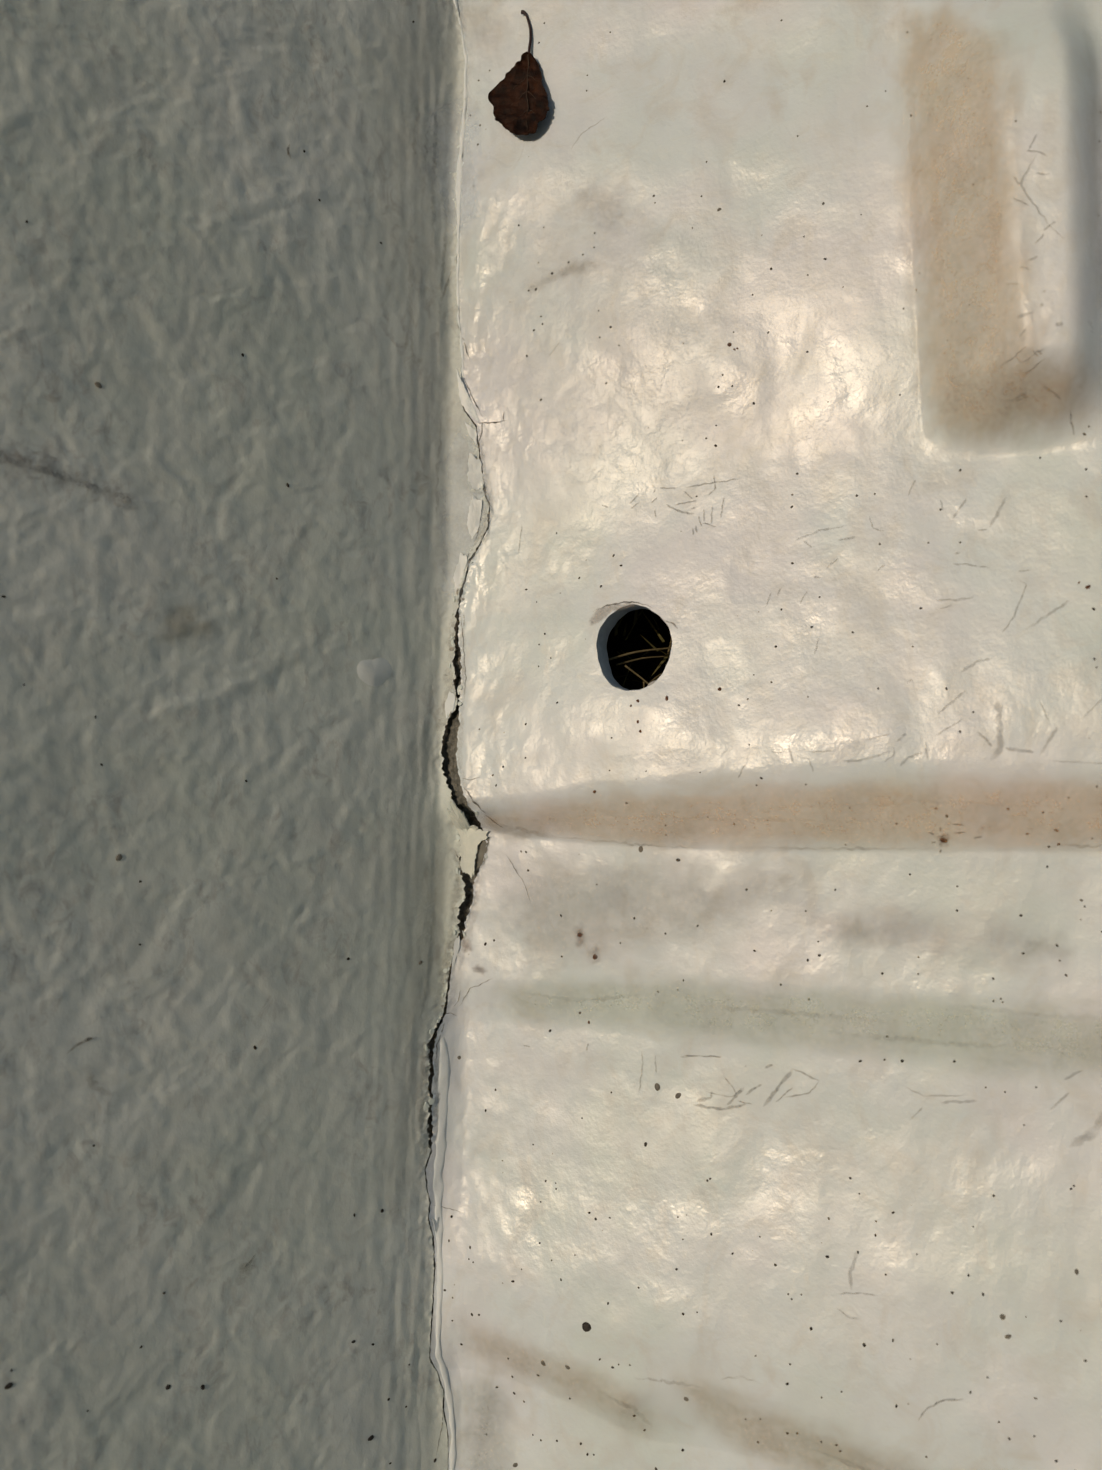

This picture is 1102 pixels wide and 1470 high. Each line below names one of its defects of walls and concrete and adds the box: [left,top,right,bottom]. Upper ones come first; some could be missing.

crack [423,343,527,1446]
spalling [477,837,490,869]